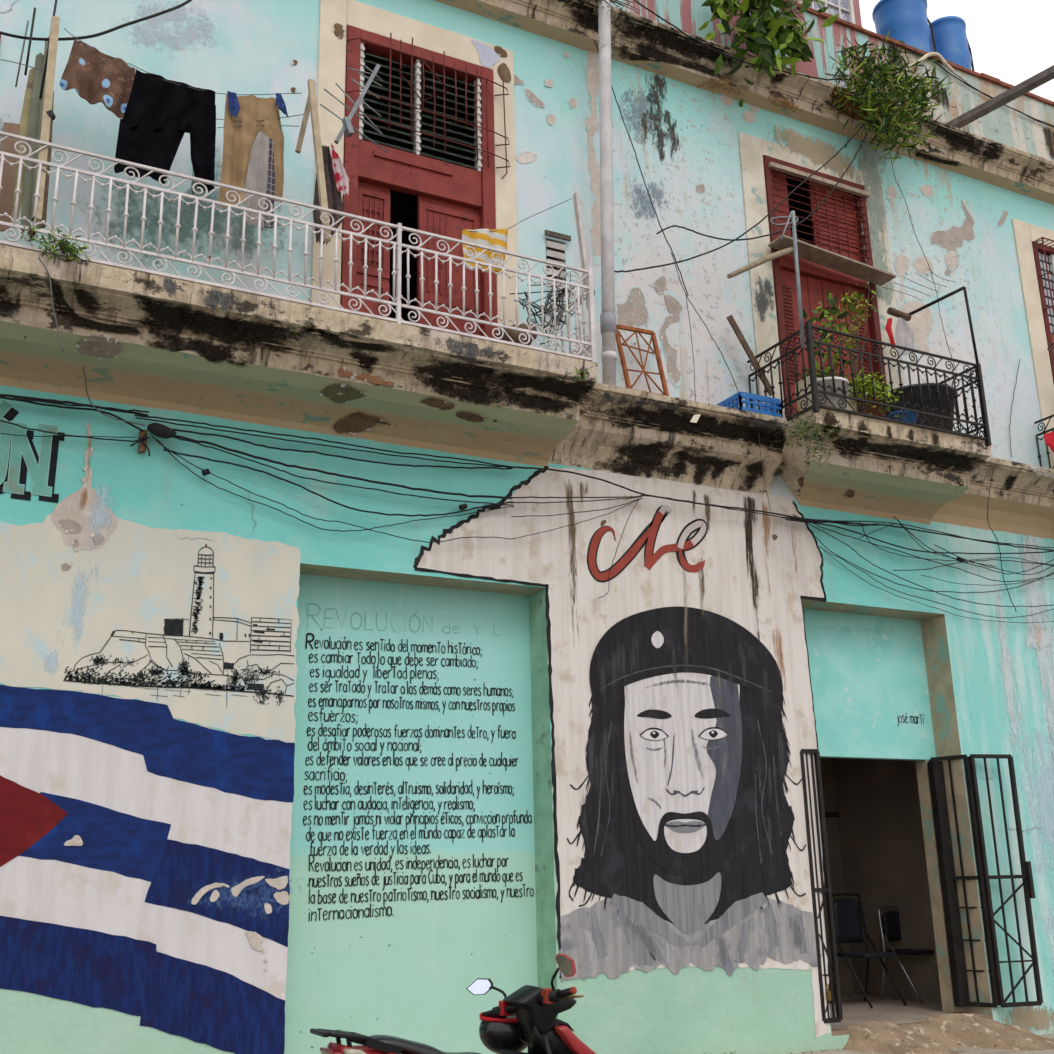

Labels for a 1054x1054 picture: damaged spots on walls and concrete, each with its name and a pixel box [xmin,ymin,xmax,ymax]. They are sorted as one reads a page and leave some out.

leakage [557,0,598,32]
leakage [611,11,744,166]
leakage [915,119,1005,166]
peeling [894,196,977,279]
leakage [46,273,400,373]
peeling [615,275,683,388]
peeling [899,298,934,357]
leakage [819,412,994,475]
peeling [50,421,118,570]
leakage [412,337,788,640]
peeling [191,876,289,914]
spalling [245,931,268,971]